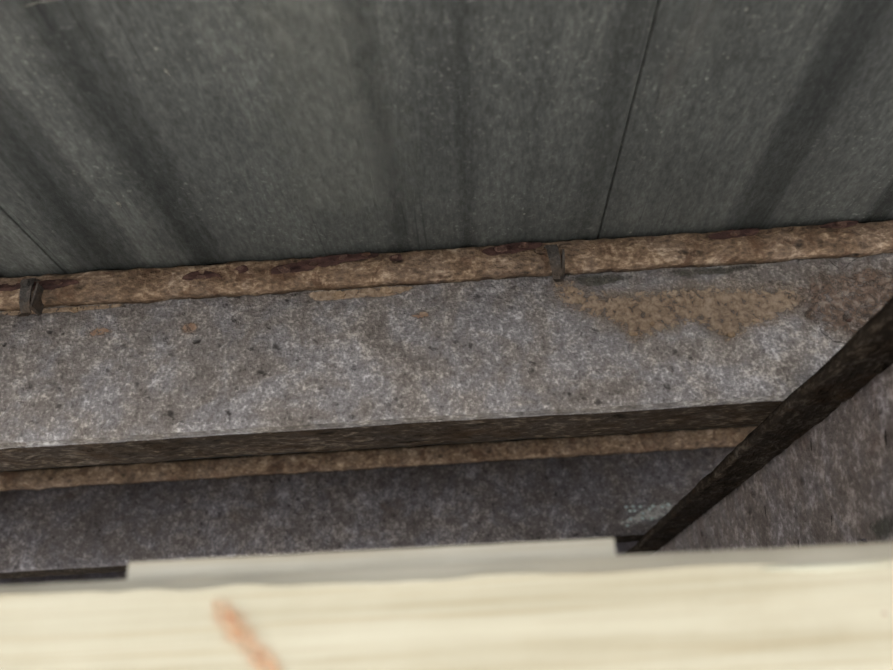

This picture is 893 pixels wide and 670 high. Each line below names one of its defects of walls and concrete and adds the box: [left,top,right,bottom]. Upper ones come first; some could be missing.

corrosion [482,242,542,256]
corrosion [270,252,402,274]
corrosion [182,270,222,285]
corrosion [0,283,21,296]
corrosion [553,265,893,343]